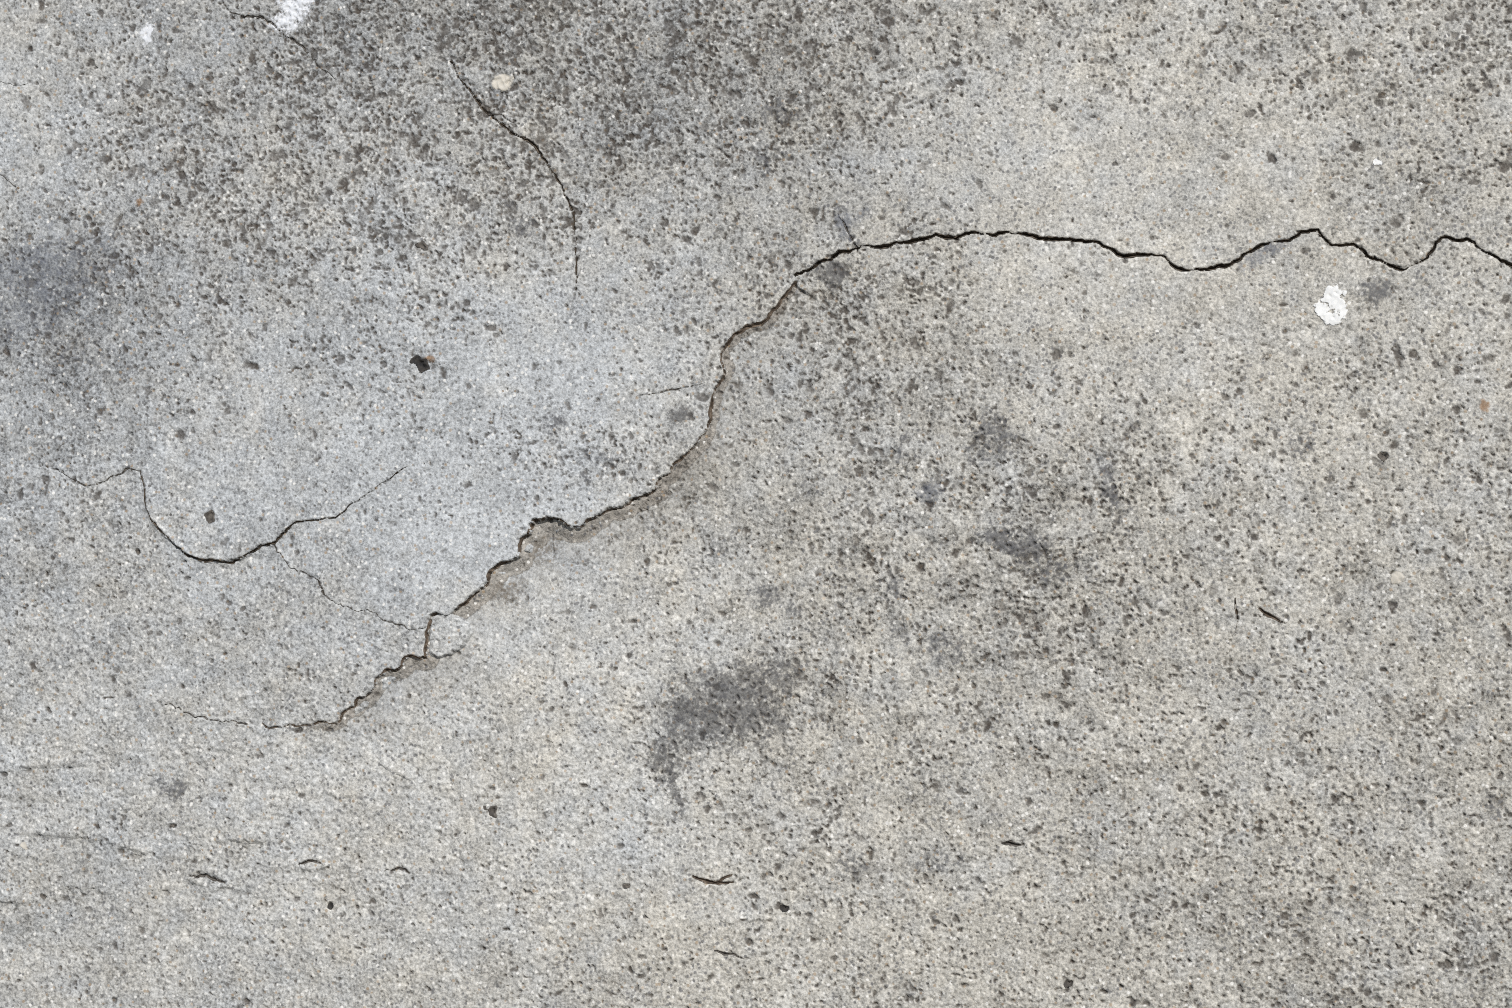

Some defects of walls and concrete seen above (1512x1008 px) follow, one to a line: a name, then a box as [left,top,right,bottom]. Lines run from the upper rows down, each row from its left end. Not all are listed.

crack [449,61,578,290]
crack [794,213,1512,276]
crack [46,466,426,630]
crack [160,703,248,725]